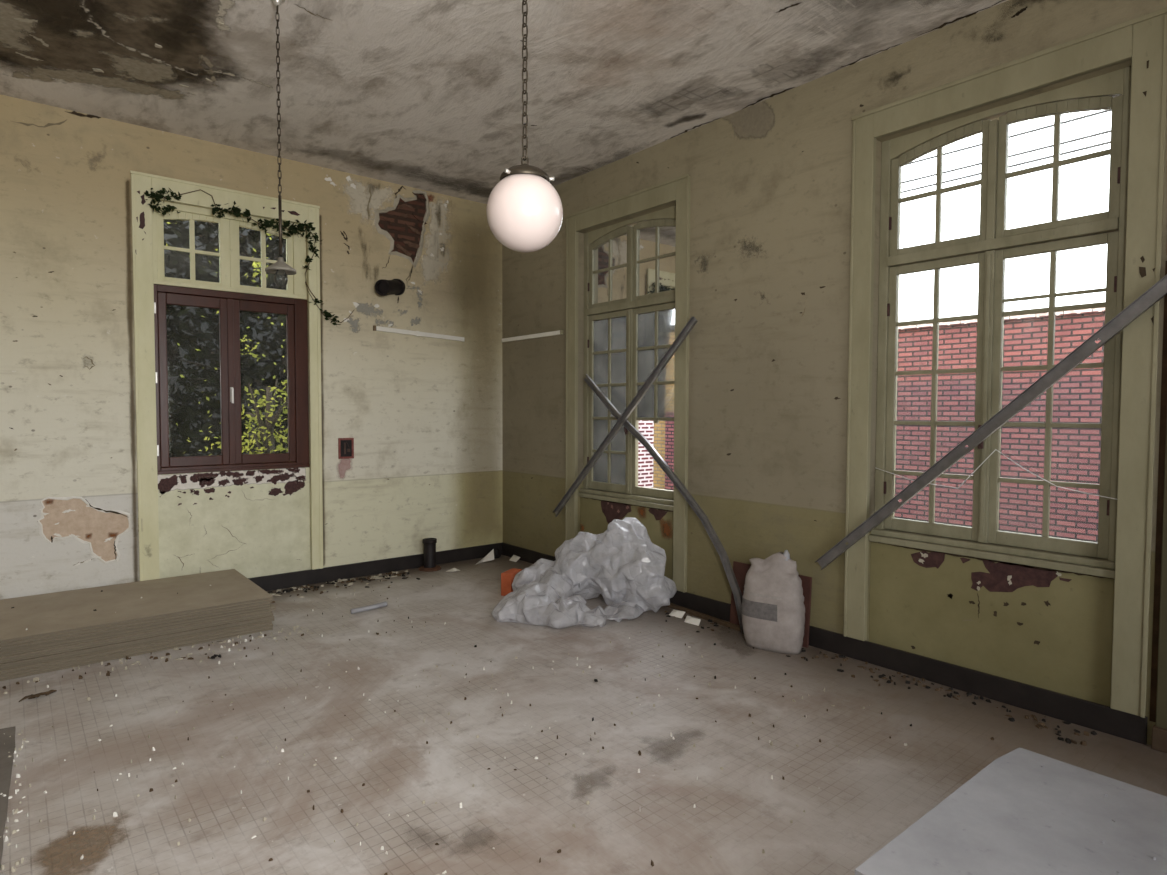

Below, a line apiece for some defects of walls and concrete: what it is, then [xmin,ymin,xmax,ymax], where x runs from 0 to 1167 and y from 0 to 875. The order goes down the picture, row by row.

leakage [0,0,237,89]
spalling [325,176,450,294]
peeling [158,468,306,505]
spalling [37,496,131,566]
peeling [601,501,673,538]
peeling [911,551,945,569]
peeling [960,558,1072,592]